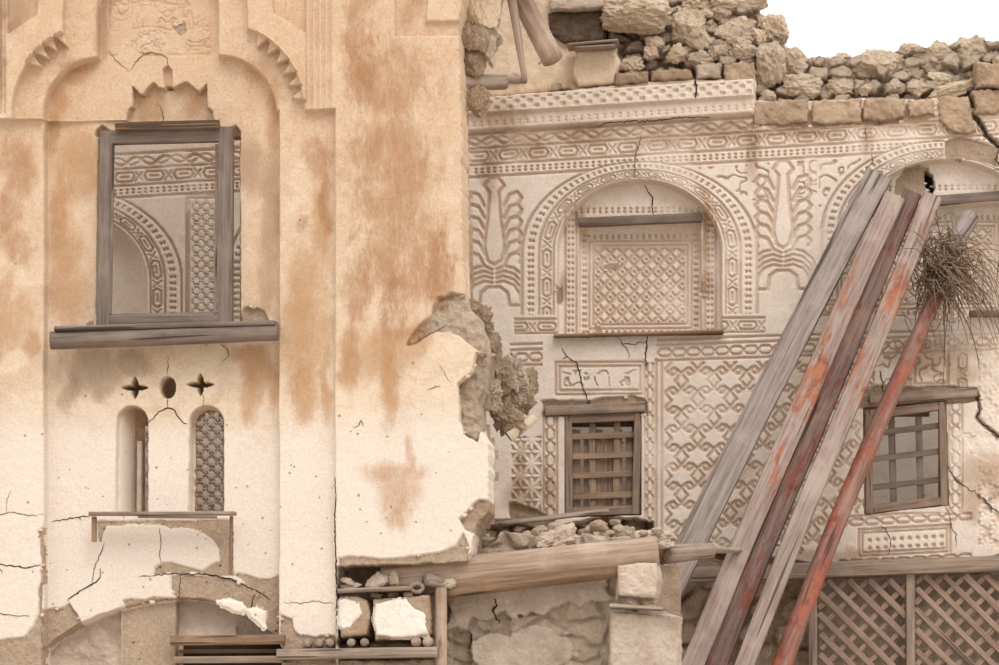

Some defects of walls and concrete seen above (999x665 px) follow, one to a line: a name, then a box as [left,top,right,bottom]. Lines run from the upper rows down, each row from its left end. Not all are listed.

crack [596,78,710,215]
crack [971,100,999,170]
spalling [408,293,648,442]
crack [976,397,999,441]
crack [0,492,90,522]
crack [68,543,105,622]
crack [140,477,340,633]
peeling [97,520,430,665]
flaking render [681,582,714,659]
flaking render [728,580,766,665]
flaking render [756,579,804,665]
flaking render [793,624,818,665]